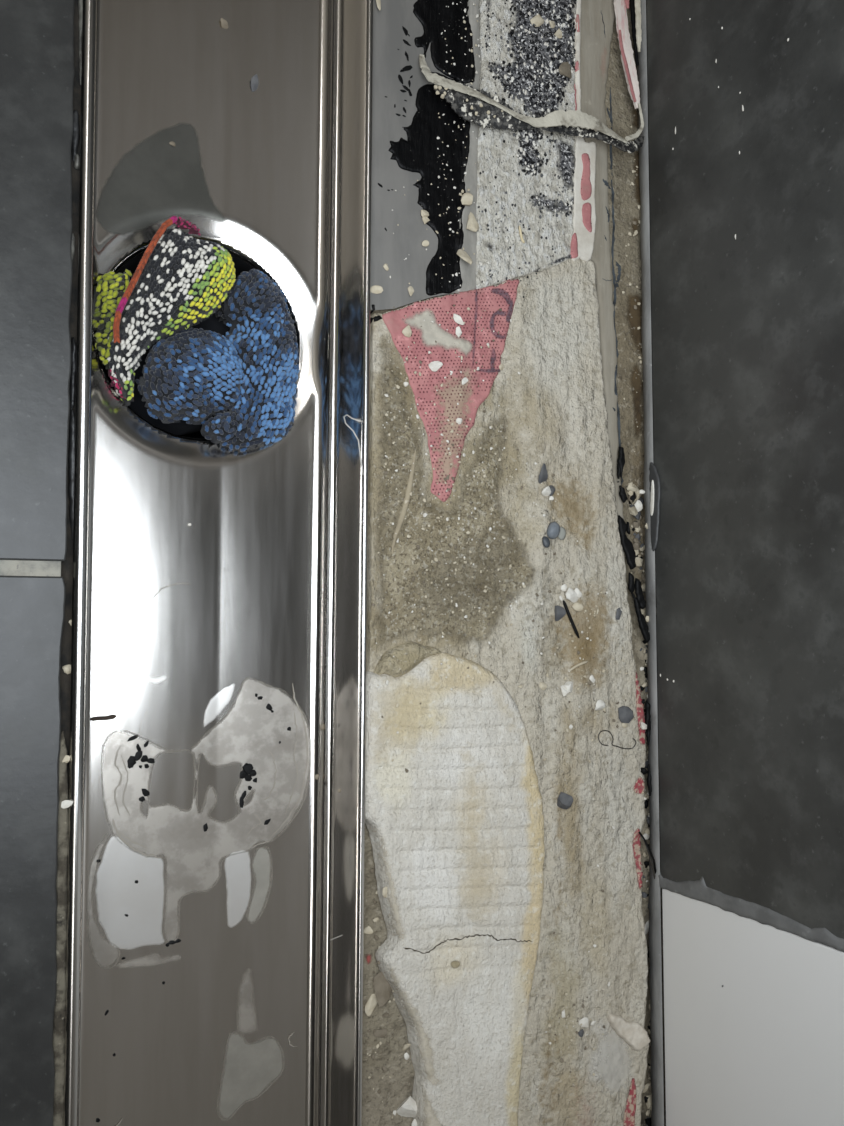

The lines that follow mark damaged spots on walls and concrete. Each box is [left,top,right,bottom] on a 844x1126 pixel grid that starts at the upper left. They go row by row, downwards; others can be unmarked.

peeling [530,14,562,38]
peeling [630,0,642,66]
peeling [385,26,644,154]
peeling [461,192,479,232]
peeling [457,249,473,264]
damp [113,746,160,858]
damp [245,687,308,922]
crack [405,934,532,954]
damp [219,1032,297,1118]